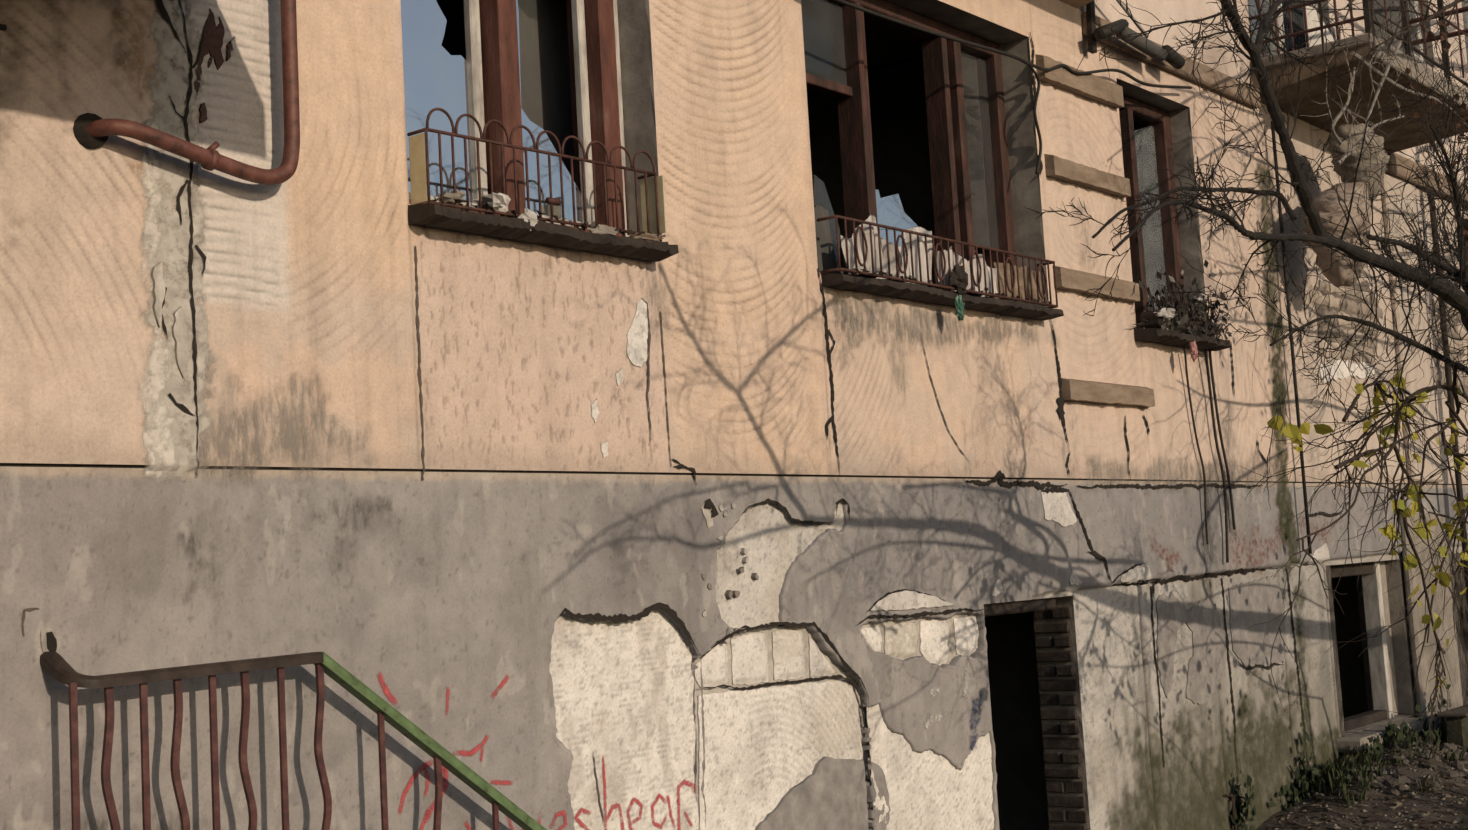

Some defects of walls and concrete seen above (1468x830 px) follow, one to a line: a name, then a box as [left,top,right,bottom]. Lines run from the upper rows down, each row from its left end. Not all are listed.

peeling [194,9,237,123]
crack [155,0,207,474]
peeling [150,262,189,378]
peeling [615,298,652,444]
crack [818,268,840,481]
peeling [1040,492,1077,527]
crack [919,319,1308,785]
crack [1309,509,1344,517]
spalling [546,497,1003,830]